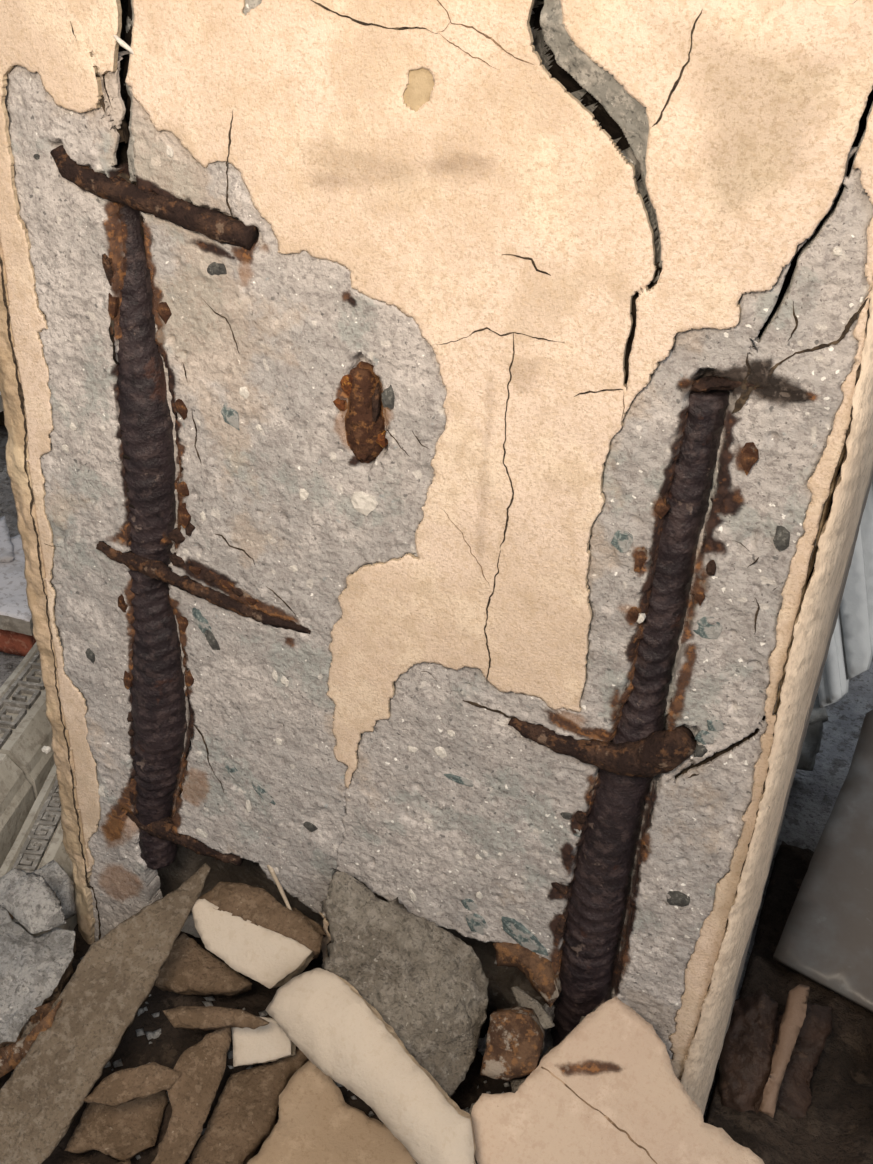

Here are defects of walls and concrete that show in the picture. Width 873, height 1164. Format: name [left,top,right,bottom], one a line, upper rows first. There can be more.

crack [0,257,101,939]
spalling [5,51,163,941]
rust [102,201,127,340]
crack [96,0,137,185]
rust [141,221,299,624]
rust [333,361,388,466]
peeling [404,68,434,112]
spalling [129,86,873,1060]
crack [311,0,702,417]
rust [546,406,690,743]
rust [667,410,759,731]
crack [674,89,873,892]